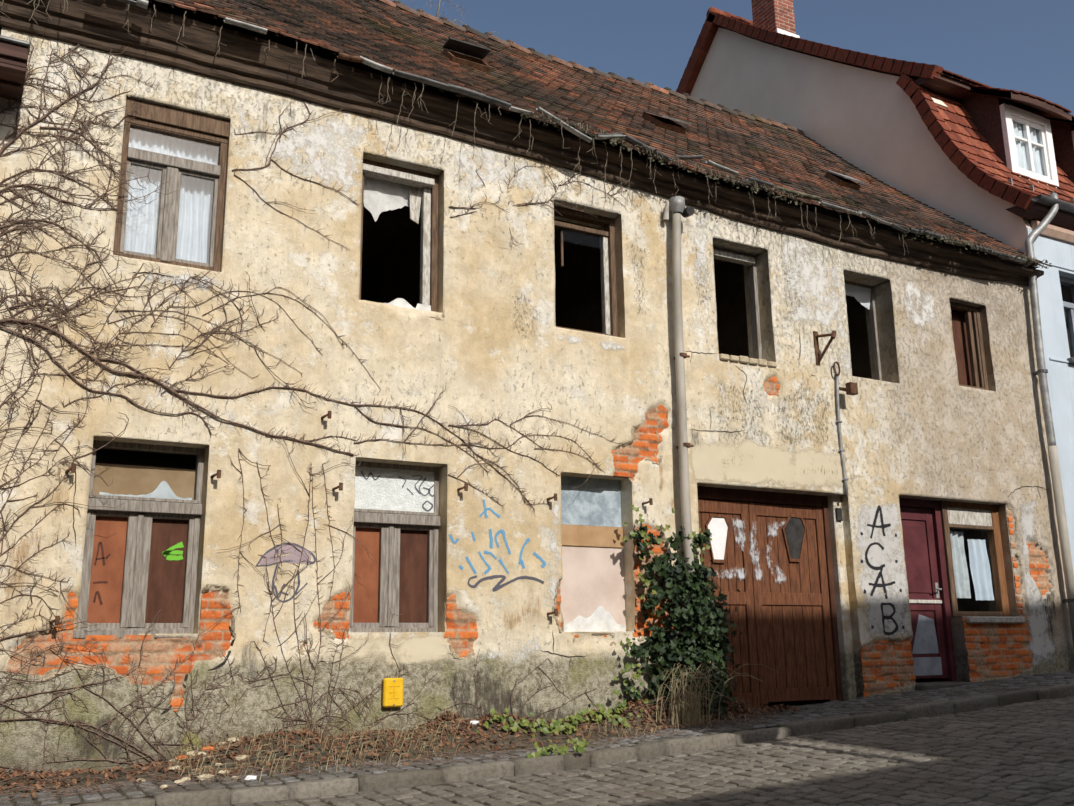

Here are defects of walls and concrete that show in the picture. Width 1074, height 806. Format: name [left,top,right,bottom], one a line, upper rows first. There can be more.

flaking render [764,376,780,397]
flaking render [611,404,669,481]
flaking render [5,584,236,712]
flaking render [297,591,350,657]
flaking render [443,594,478,661]
peeling [857,503,916,698]
flaking render [962,502,1055,681]